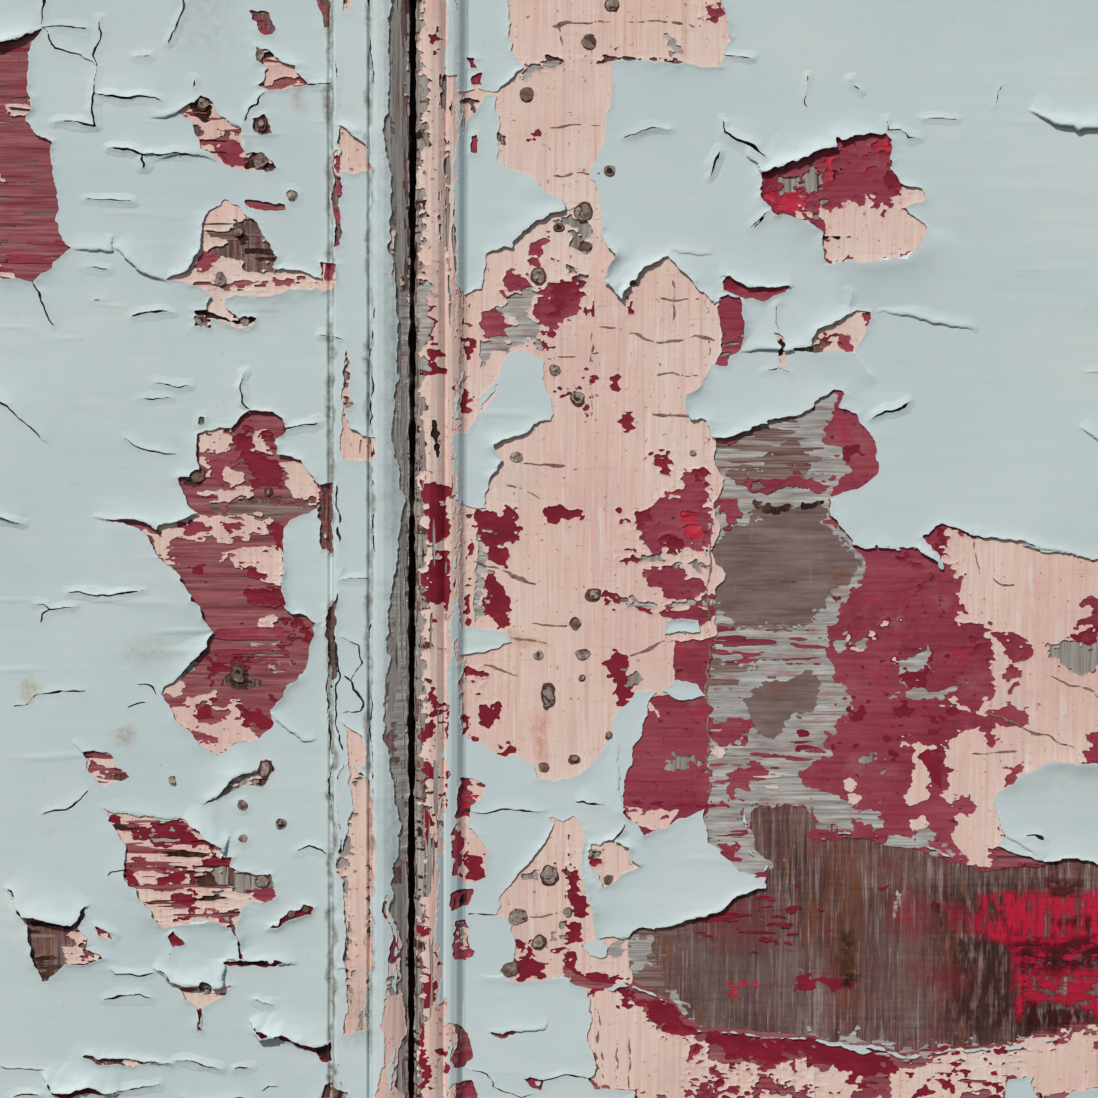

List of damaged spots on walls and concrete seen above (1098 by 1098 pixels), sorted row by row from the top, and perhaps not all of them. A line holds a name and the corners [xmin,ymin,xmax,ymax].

crack [37,0,193,168]
peeling [250,10,275,35]
peeling [317,0,352,28]
peeling [0,24,337,329]
peeling [331,0,1098,1098]
peeling [8,410,338,1031]
peeling [315,1082,348,1098]